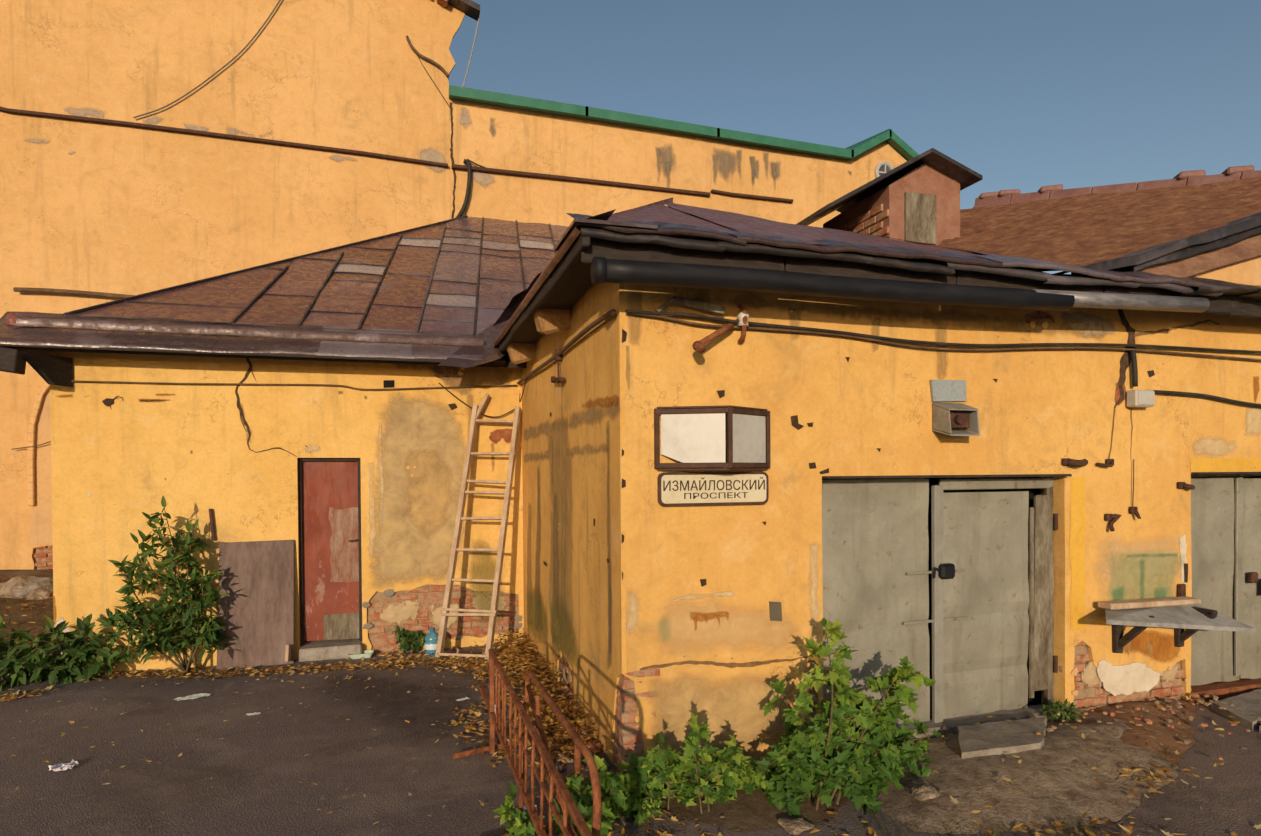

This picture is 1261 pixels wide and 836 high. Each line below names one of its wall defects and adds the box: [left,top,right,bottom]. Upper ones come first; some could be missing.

leakage [657,147,673,181]
leakage [713,150,779,182]
leakage [626,291,641,385]
flaking render [33,545,53,569]
peeling [362,397,523,652]
leakage [524,395,618,665]
peeling [53,597,72,656]
corrosion [691,612,728,630]
flaking render [1059,641,1192,713]